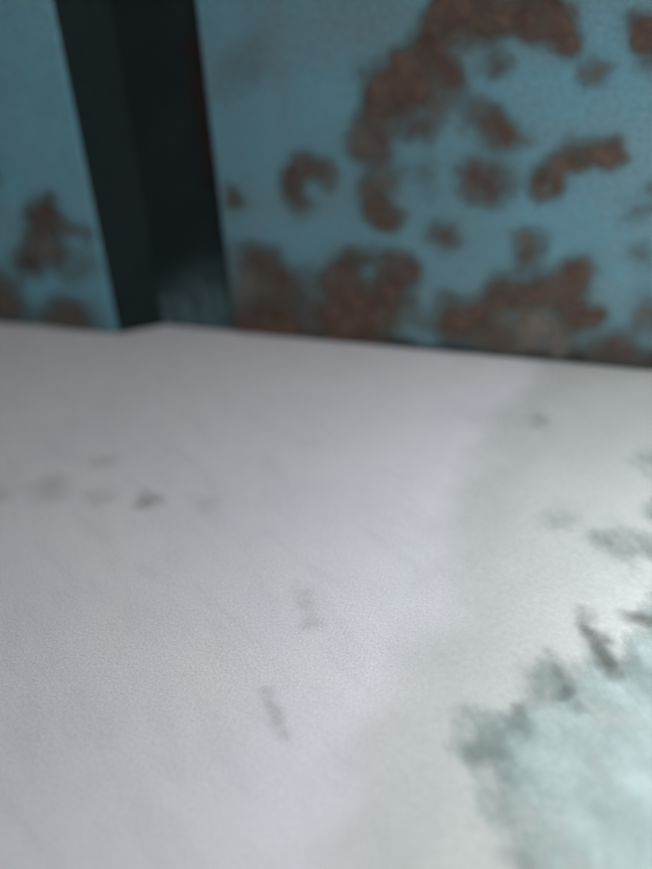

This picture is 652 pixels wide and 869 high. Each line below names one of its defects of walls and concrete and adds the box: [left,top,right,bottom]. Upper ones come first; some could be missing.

corrosion [629,14,652,54]
corrosion [189,35,216,167]
corrosion [351,0,582,231]
corrosion [282,154,337,210]
corrosion [531,137,629,202]
corrosion [15,193,89,272]
corrosion [0,276,21,324]
corrosion [37,299,103,333]
corrosion [231,230,652,370]
water stain [382,363,652,869]